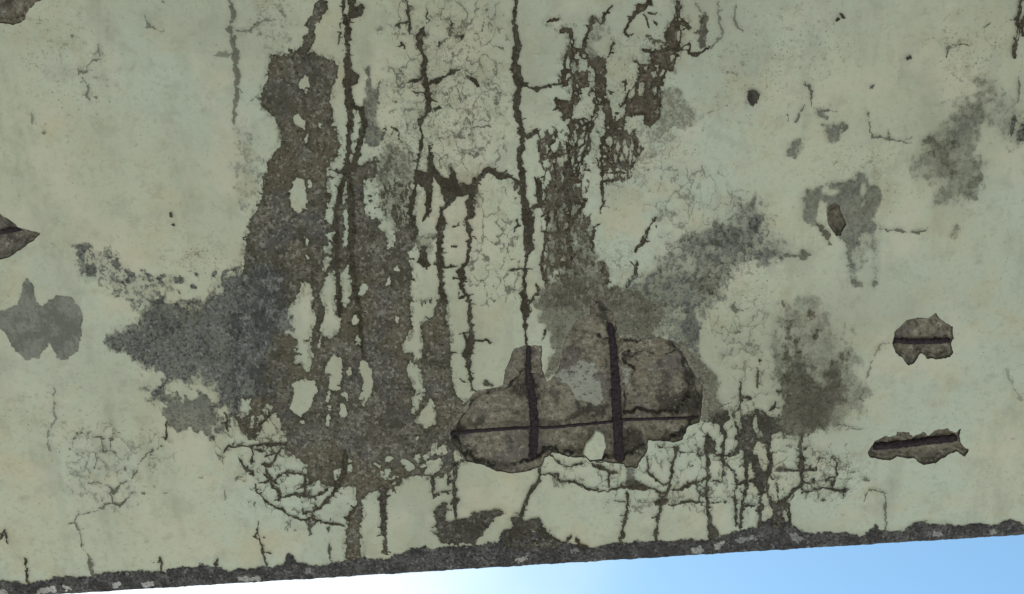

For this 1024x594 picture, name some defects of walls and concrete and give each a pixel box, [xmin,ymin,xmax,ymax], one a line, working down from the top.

crack [225,0,286,125]
peeling [0,279,83,360]
leakage [72,243,135,297]
leakage [126,269,184,311]
crack [328,0,562,392]
leakage [533,0,849,540]
leakage [803,173,882,288]
spalling [892,313,954,366]
crack [214,403,356,567]
spalling [429,296,704,551]
crack [516,434,709,545]
spalling [868,428,969,465]